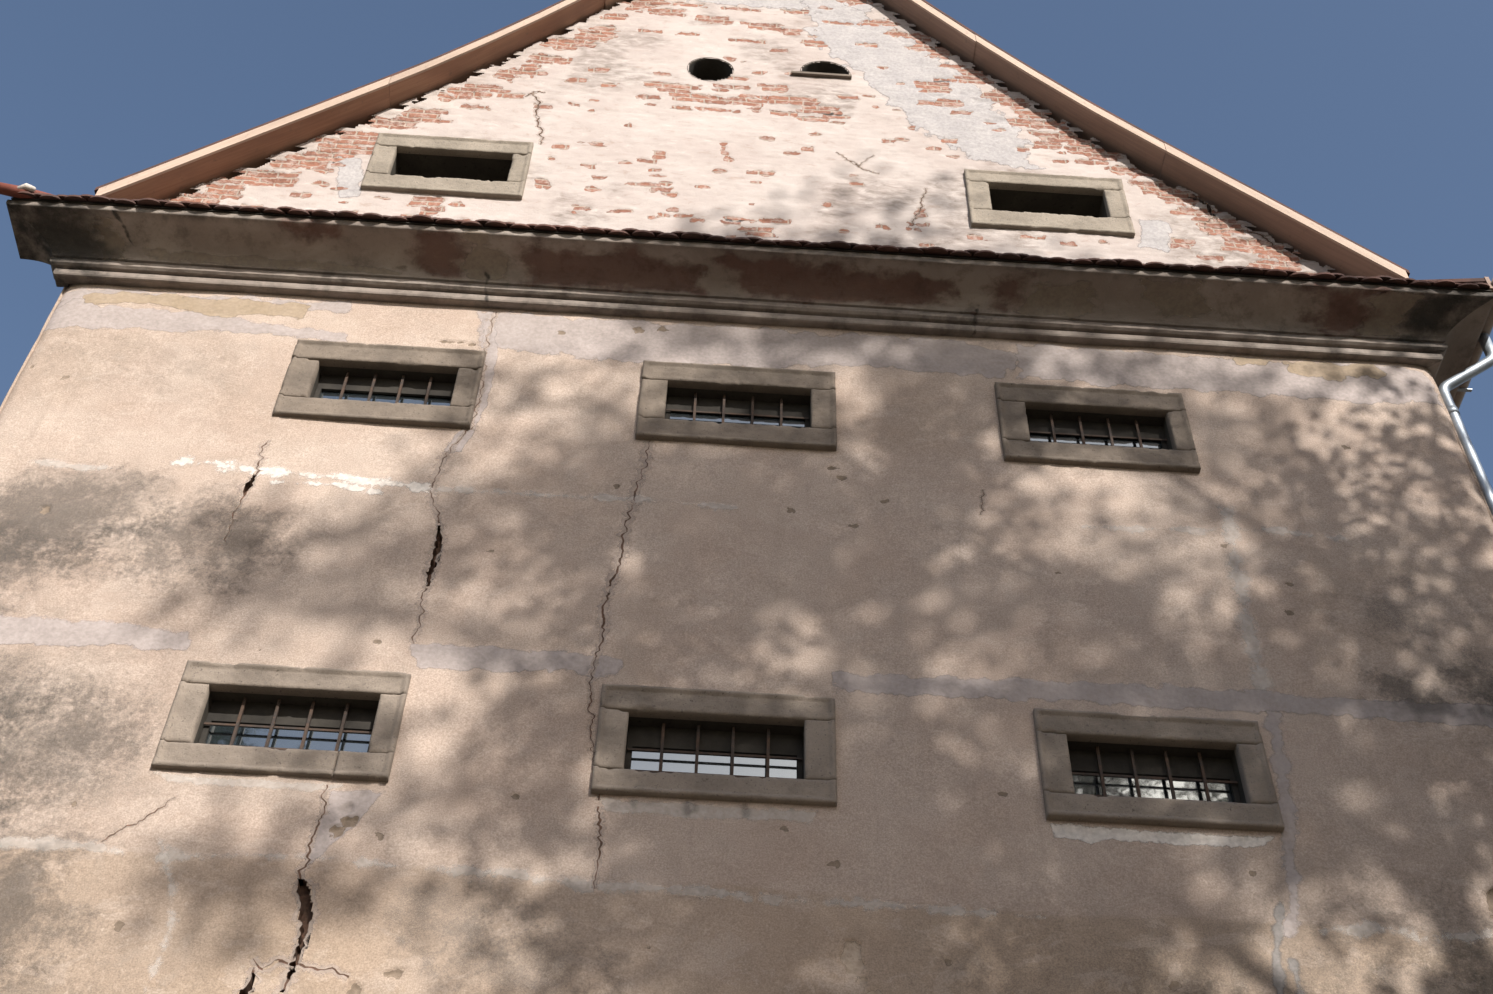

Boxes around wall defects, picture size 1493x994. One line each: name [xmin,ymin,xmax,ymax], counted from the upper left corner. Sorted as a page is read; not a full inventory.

flaking render [164,0,1316,274]
crack [222,440,271,545]
crack [409,272,499,643]
crack [235,784,350,994]
spalling [329,816,359,840]